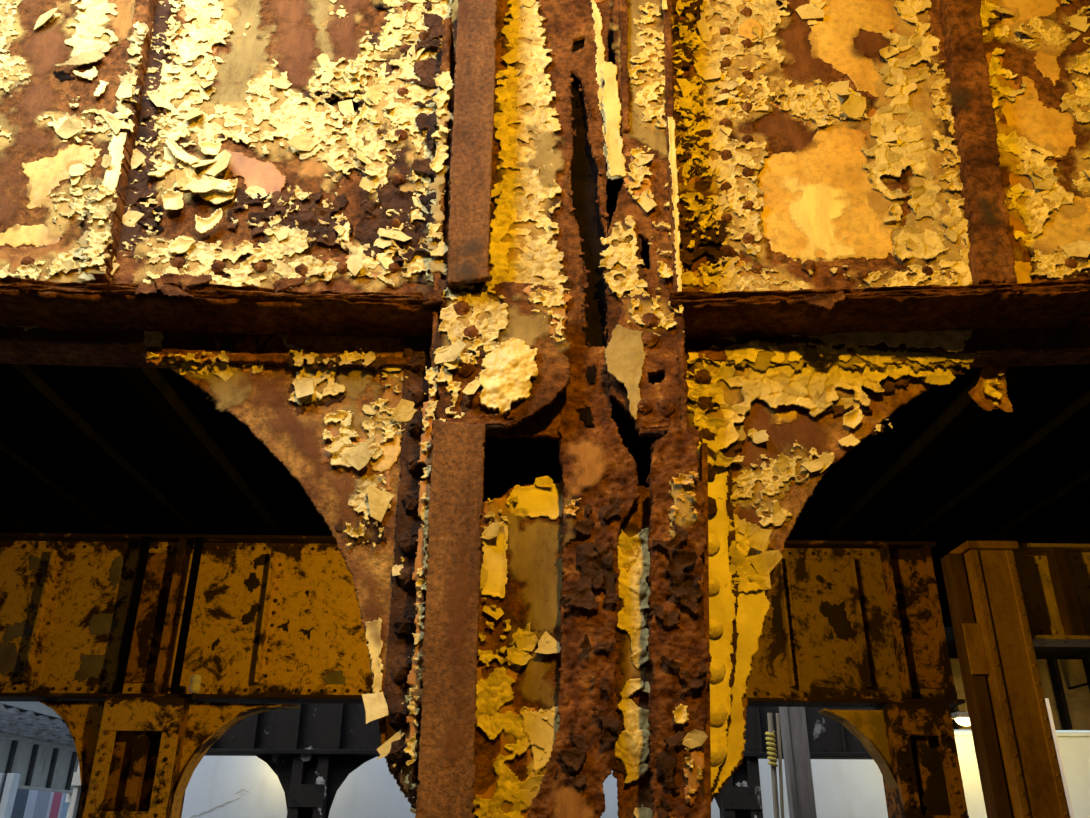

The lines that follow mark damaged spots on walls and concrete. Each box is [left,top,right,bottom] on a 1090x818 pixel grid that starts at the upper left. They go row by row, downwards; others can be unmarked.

corrosion [135,273,213,298]
peeling [0,0,572,818]
corrosion [273,276,307,293]
corrosion [560,441,622,611]
peeling [614,520,652,784]
corrosion [652,471,703,629]
corrosion [657,730,705,818]
corrosion [671,0,728,285]
peeling [591,0,973,420]
peeling [673,330,1013,795]
peeling [918,743,951,815]
peeling [980,0,1090,283]